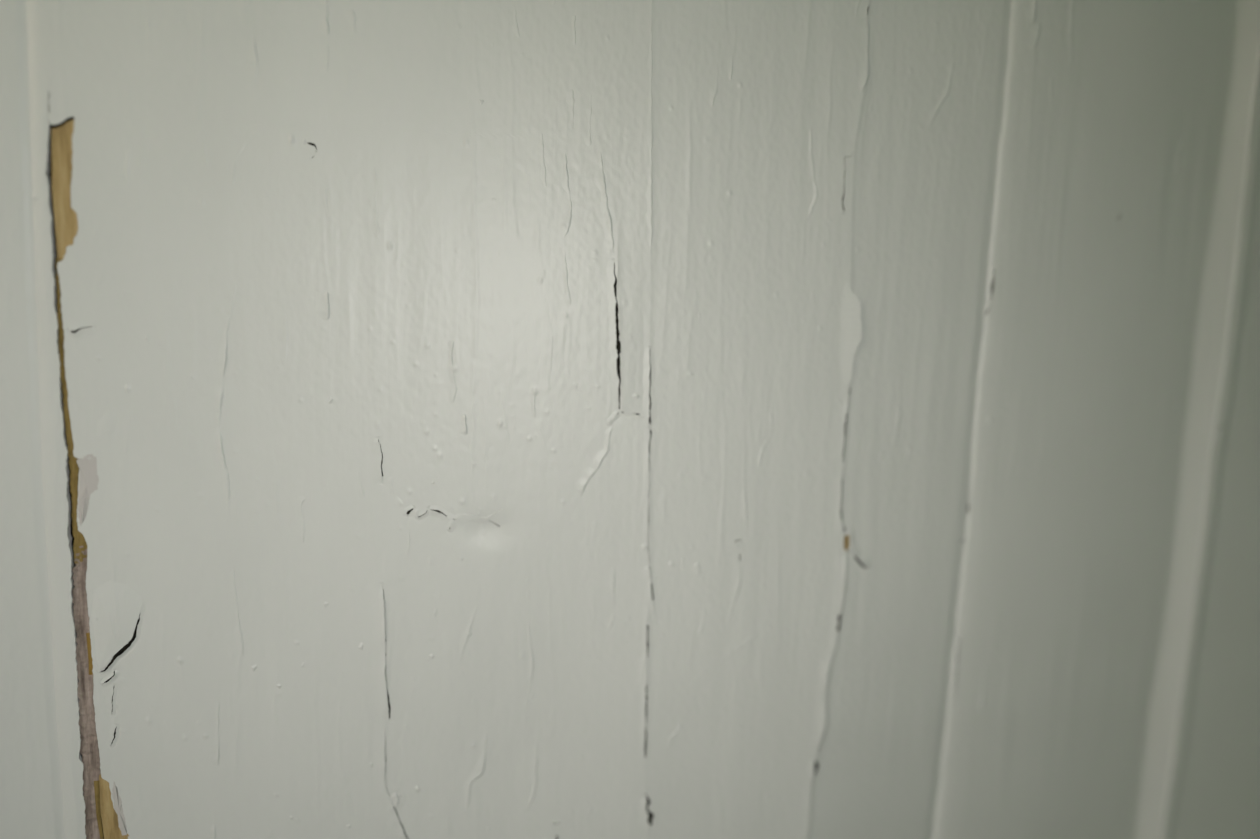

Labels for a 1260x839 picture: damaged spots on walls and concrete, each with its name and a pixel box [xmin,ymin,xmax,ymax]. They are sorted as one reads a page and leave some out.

peeling [76,454,99,526]
crack [831,351,873,575]
peeling [112,782,127,835]